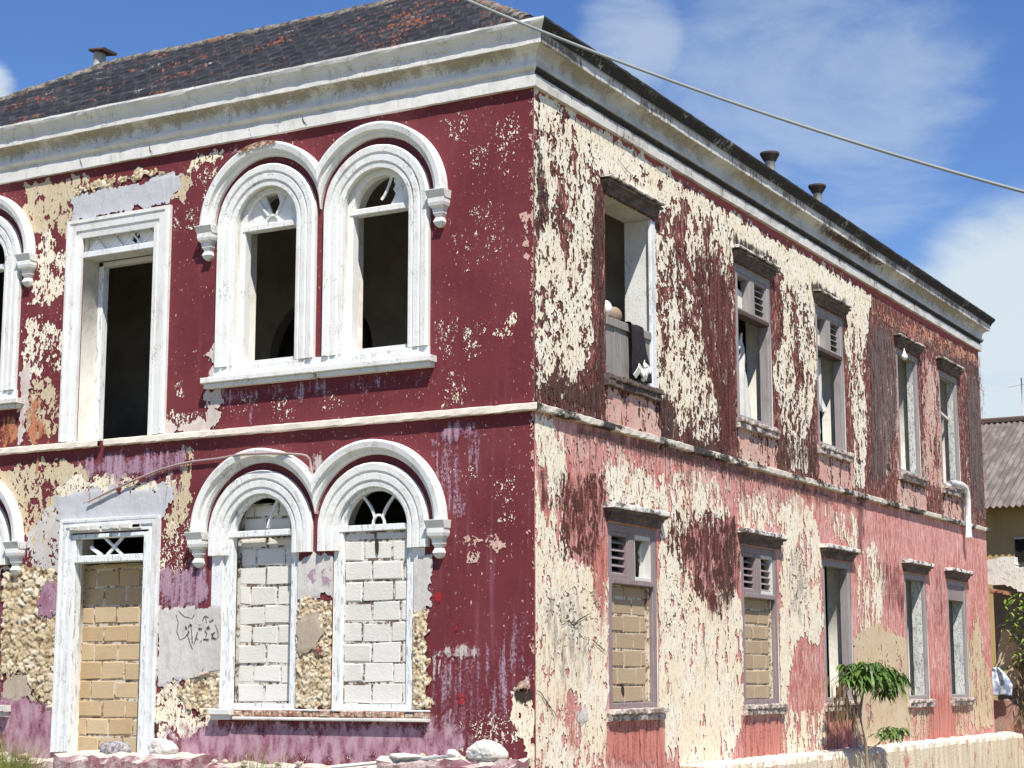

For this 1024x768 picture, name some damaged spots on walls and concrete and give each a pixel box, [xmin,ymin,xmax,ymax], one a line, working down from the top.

peeling [17,166,166,446]
peeling [170,148,224,230]
flaking render [165,343,257,446]
peeling [435,88,994,768]
spalling [0,445,222,741]
spalling [295,551,333,712]